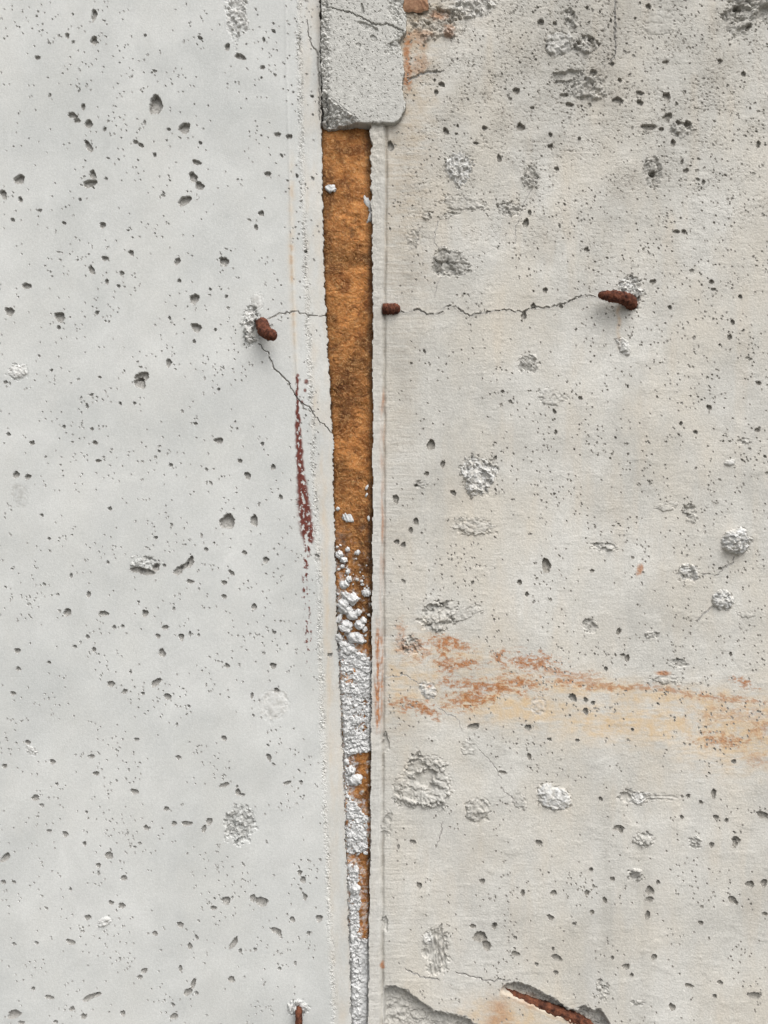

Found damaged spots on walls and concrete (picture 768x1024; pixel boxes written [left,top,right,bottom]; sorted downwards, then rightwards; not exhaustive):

spalling [322,92,359,132]
corrosion [255,317,278,341]
corrosion [382,303,400,315]
crack [399,276,594,317]
corrosion [598,290,638,350]
crack [259,344,331,433]
corrosion [294,372,317,684]
corrosion [372,386,768,787]
corrosion [295,1005,303,1024]
spalling [383,985,476,1024]
corrosion [442,982,594,1024]
spalling [500,978,611,1024]